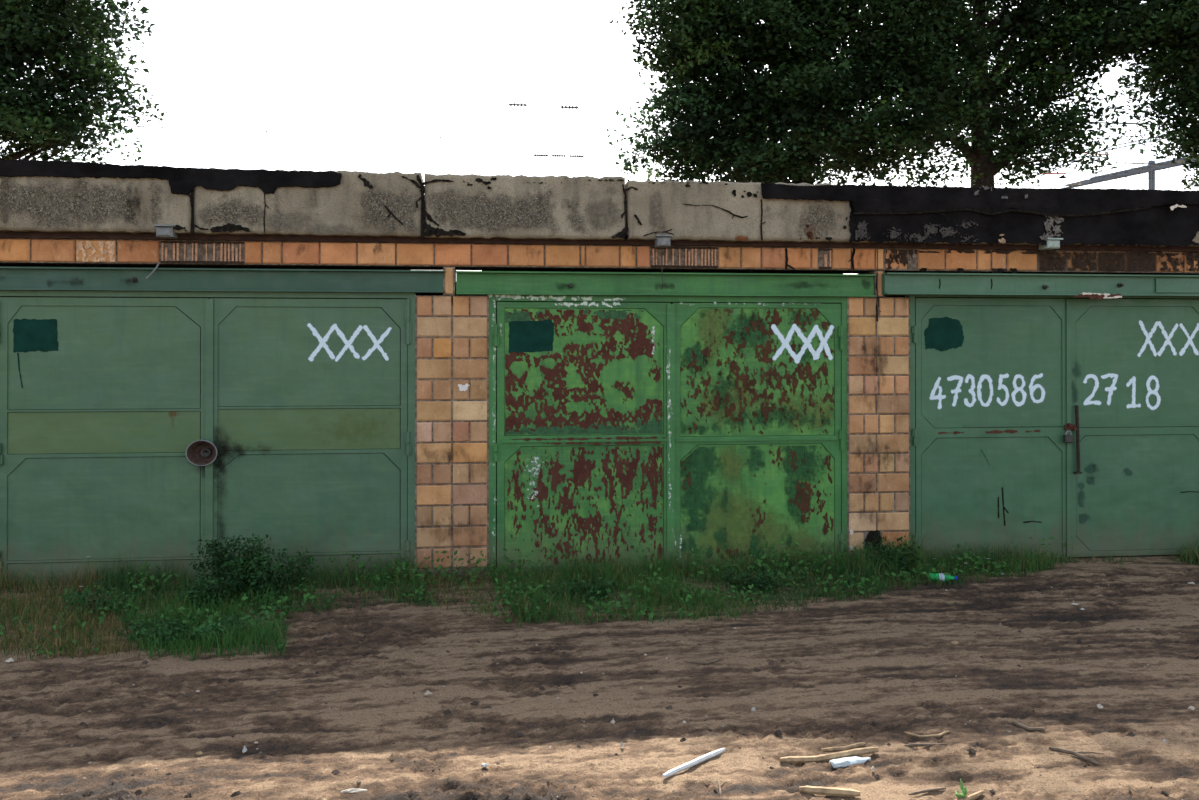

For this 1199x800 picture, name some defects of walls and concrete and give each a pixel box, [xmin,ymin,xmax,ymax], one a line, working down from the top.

crack [384,175,454,238]
crack [621,184,795,271]
spalling [800,217,1199,273]
rust [680,308,835,435]
rust [505,309,665,566]
rust [754,445,833,554]